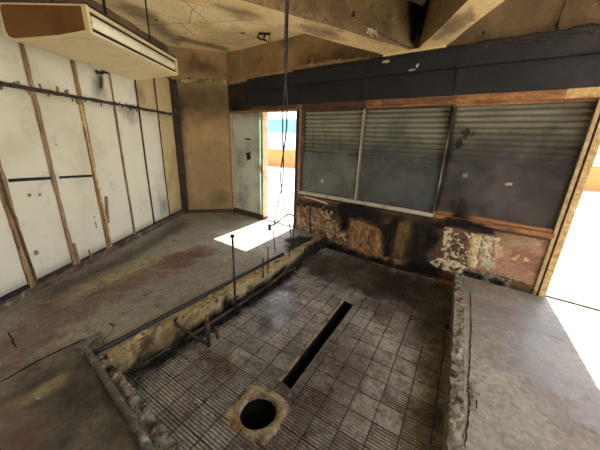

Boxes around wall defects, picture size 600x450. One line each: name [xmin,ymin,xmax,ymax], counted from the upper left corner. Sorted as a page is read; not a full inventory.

damp [340,215,349,232]
damp [392,217,411,261]
peeling [430,227,540,294]
spalling [125,206,453,450]
crack [464,292,477,448]